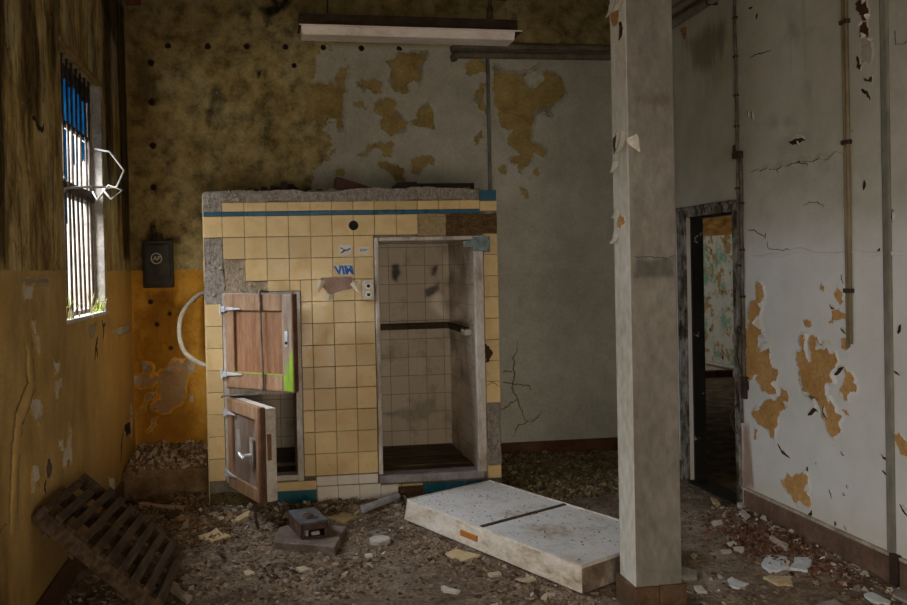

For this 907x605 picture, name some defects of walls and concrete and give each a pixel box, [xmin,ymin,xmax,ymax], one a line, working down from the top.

leakage [22,0,40,121]
spalling [854,0,871,39]
leakage [102,0,130,259]
peeling [203,49,483,212]
peeling [464,59,568,199]
crack [750,150,843,172]
peeling [417,212,497,236]
peeling [124,354,197,442]
crack [486,341,542,437]
peeling [745,274,860,444]
flaking render [30,421,73,496]
peeling [780,462,817,515]